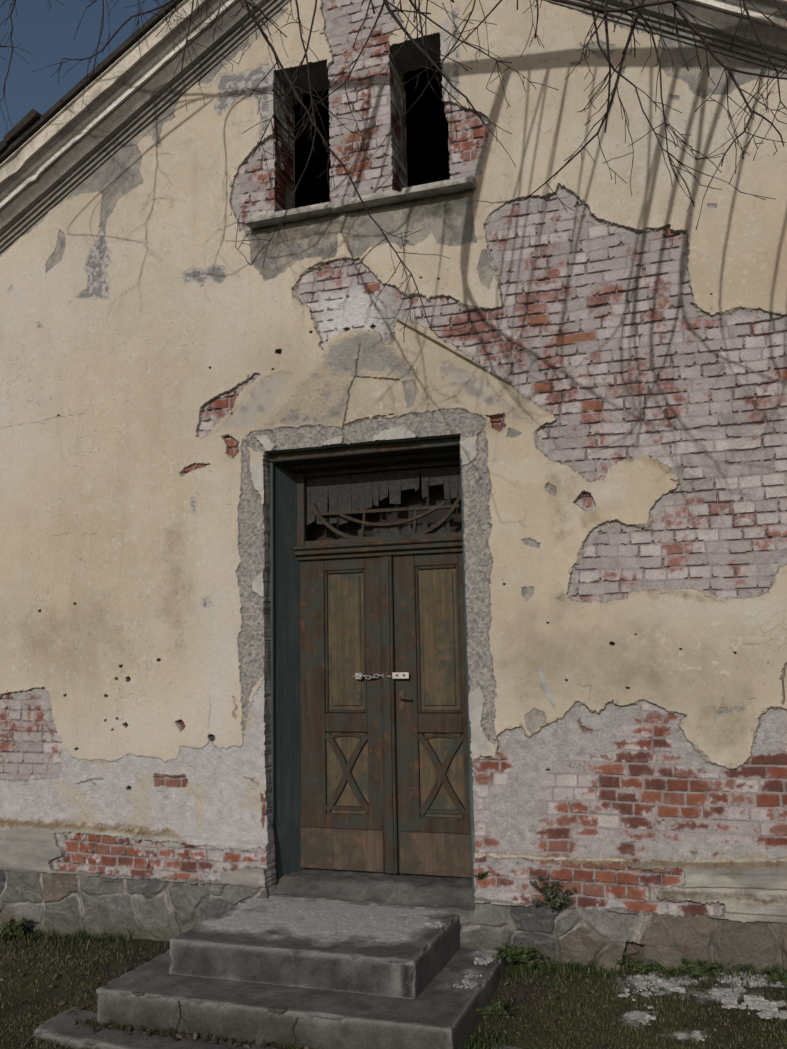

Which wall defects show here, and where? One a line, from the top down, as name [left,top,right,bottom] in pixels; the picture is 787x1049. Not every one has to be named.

peeling [0,97,181,301]
crack [341,344,400,444]
flaking render [196,0,787,604]
flaking render [0,674,268,884]
flaking render [471,699,787,865]